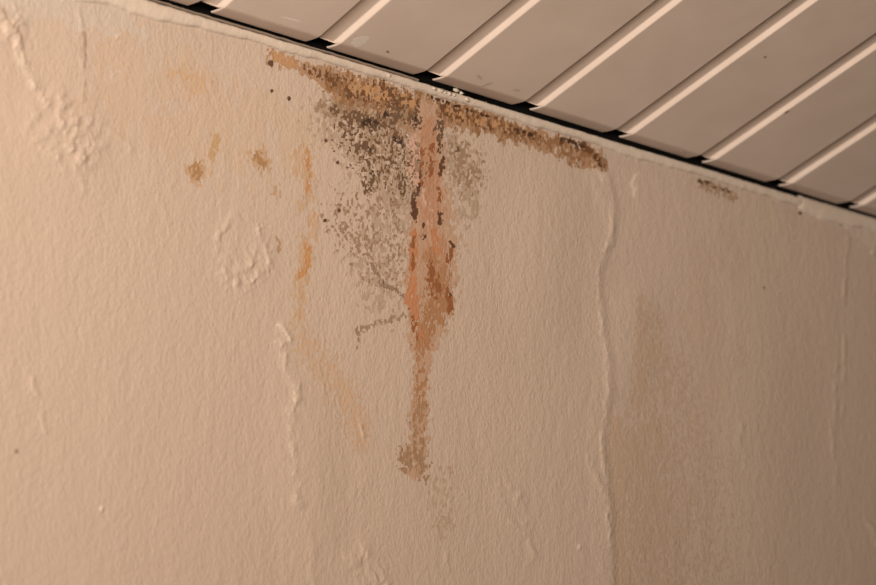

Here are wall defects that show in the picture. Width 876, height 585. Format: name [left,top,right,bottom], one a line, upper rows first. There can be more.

water stain [68,19,608,349]
rust [395,94,467,486]